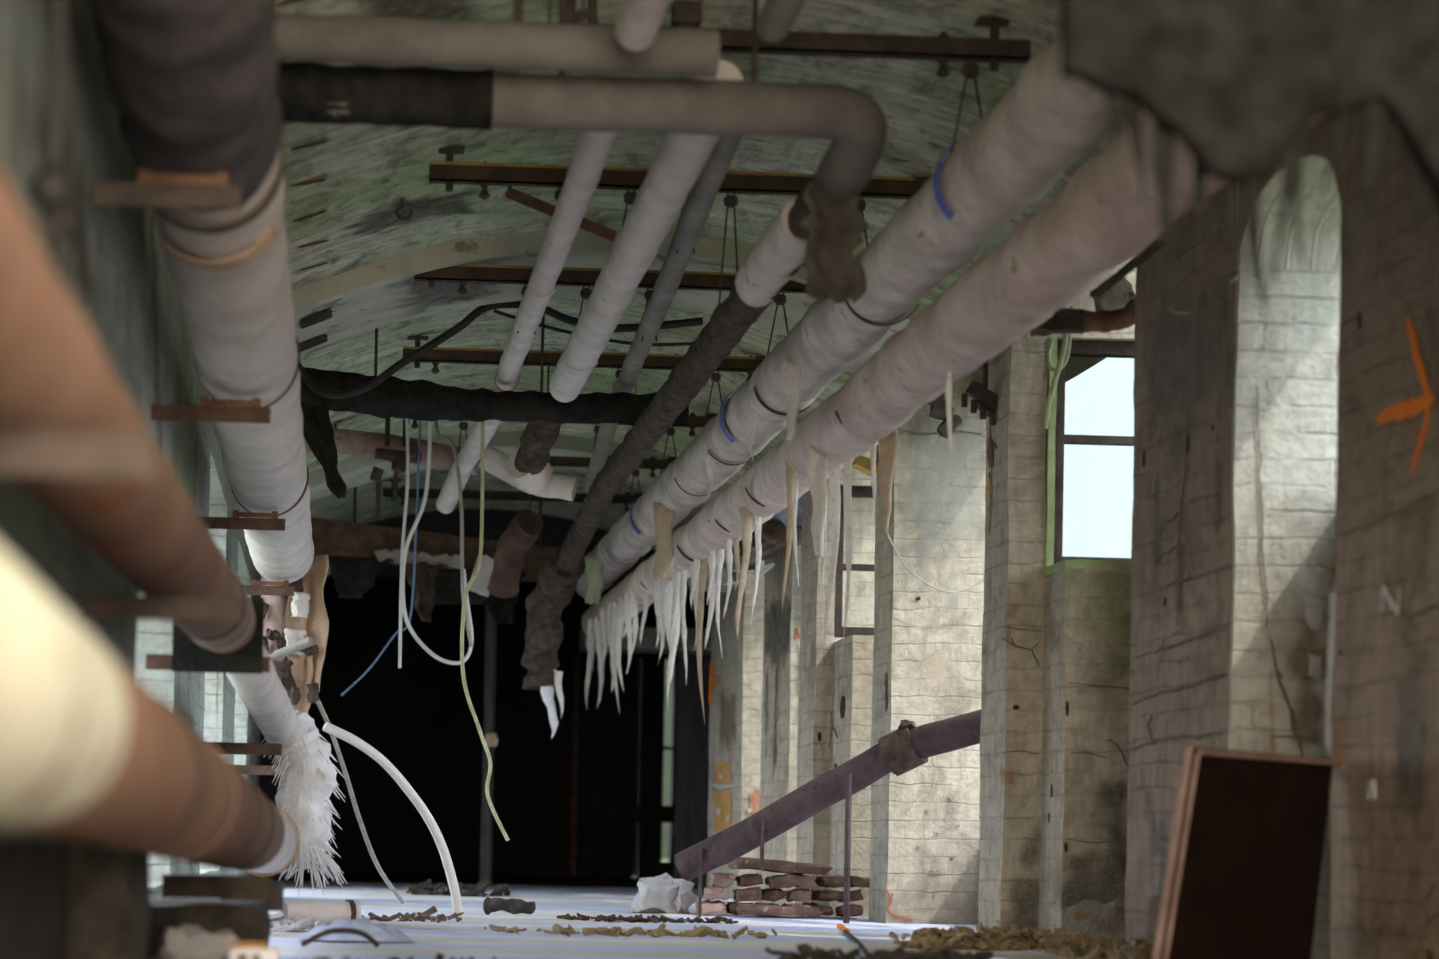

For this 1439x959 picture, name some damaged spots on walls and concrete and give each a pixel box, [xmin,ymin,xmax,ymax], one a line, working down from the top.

crack [1003,387,1317,766]